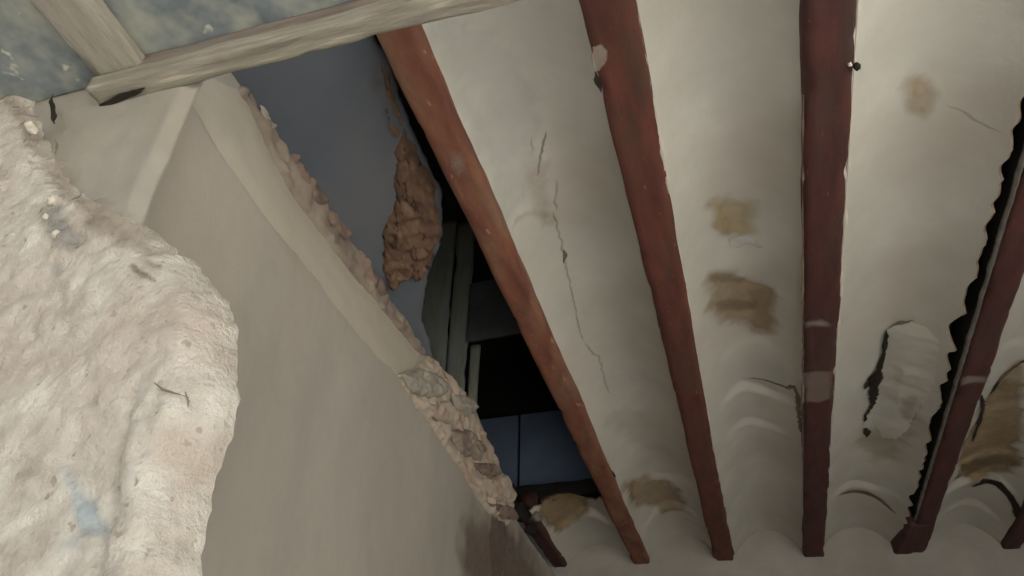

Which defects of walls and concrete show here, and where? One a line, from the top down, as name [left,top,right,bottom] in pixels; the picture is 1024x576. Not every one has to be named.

spalling [238,66,519,526]
damp [709,275,773,330]
crack [840,97,1024,519]
crack [748,378,802,432]
damp [540,493,588,531]
damp [625,477,684,512]